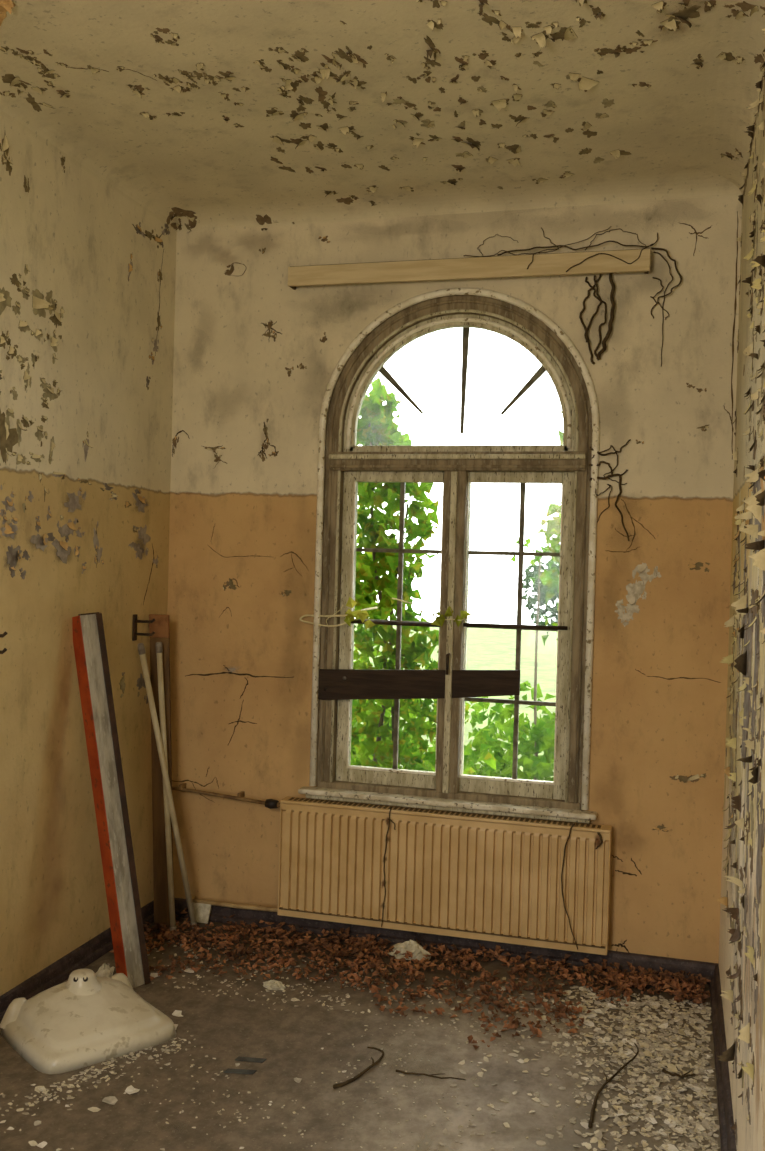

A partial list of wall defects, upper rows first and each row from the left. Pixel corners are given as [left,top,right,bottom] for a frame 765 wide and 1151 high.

peeling [150,27,180,46]
peeling [0,46,70,112]
peeling [126,63,249,128]
peeling [253,45,396,174]
peeling [381,0,765,185]
peeling [0,134,30,193]
peeling [135,207,197,248]
peeling [256,214,278,231]
peeling [0,264,159,580]
peeling [552,49,765,1151]
crack [186,665,294,745]
crack [635,669,721,683]